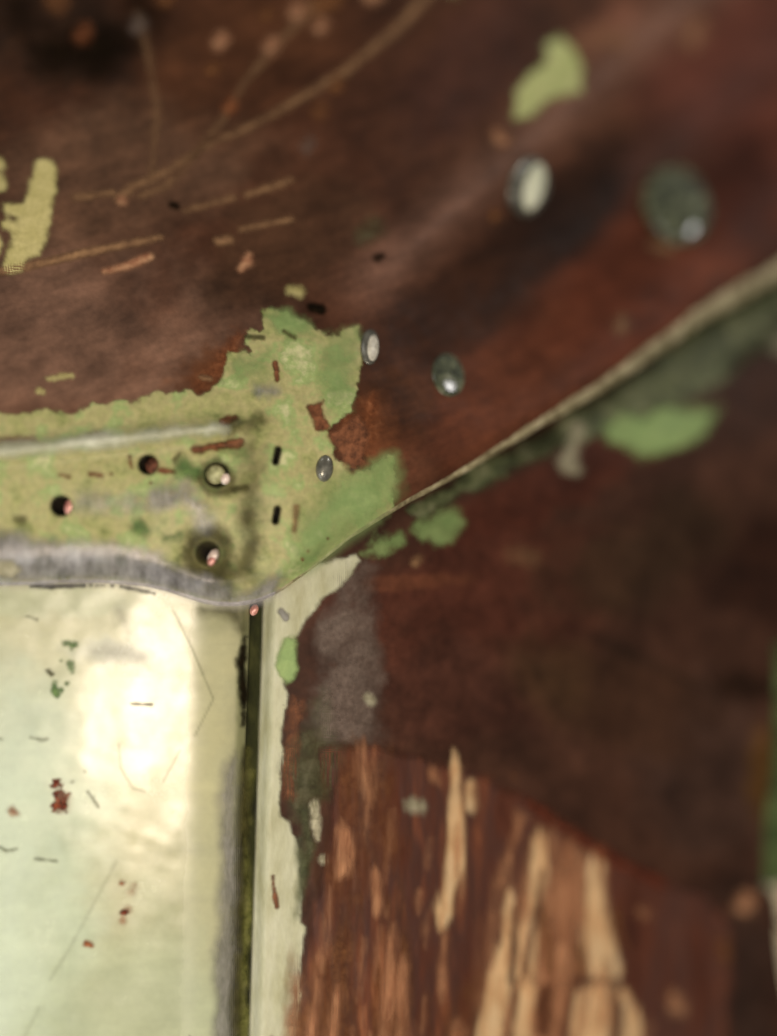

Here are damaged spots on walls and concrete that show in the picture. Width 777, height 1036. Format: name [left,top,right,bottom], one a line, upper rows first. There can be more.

peeling [0,159,57,274]
peeling [0,288,756,1036]
rust [50,779,70,812]